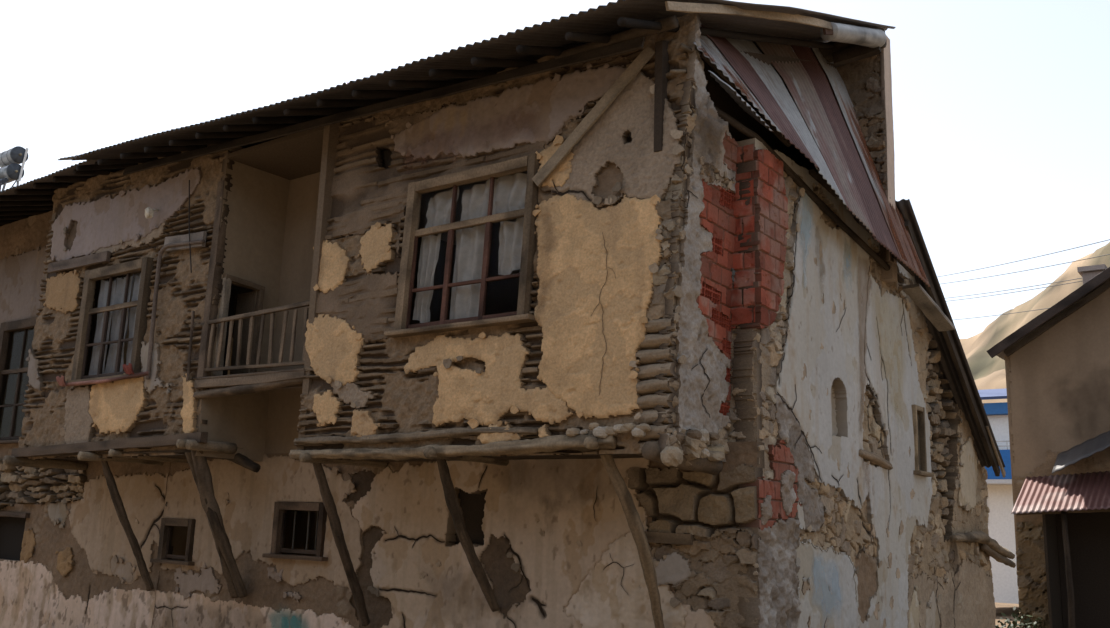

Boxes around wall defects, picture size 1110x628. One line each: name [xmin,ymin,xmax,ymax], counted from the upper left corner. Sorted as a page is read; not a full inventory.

corrosion [855,125,927,281]
peeling [0,64,839,628]
crack [692,349,710,417]
spalling [795,238,993,628]
crack [379,588,436,628]
crack [385,526,445,548]
crack [504,534,546,628]